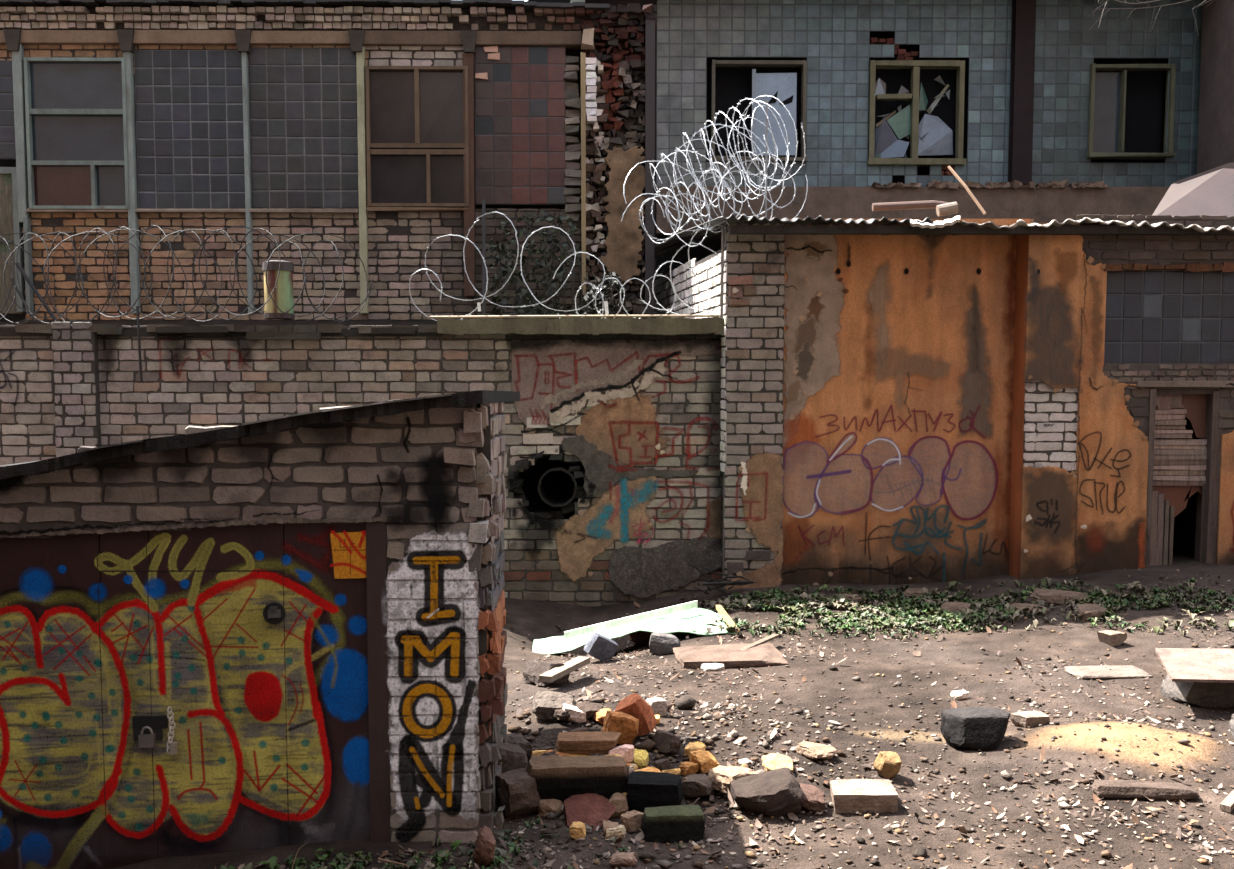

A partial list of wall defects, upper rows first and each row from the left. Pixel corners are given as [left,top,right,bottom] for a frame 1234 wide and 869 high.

flaking render [870,38,918,60]
spalling [1076,214,1234,271]
spalling [443,411,487,483]
crack [521,351,682,435]
peeling [509,235,849,599]
water stain [867,265,950,406]
water stain [960,288,992,437]
spalling [1102,363,1234,441]
spalling [467,497,489,572]